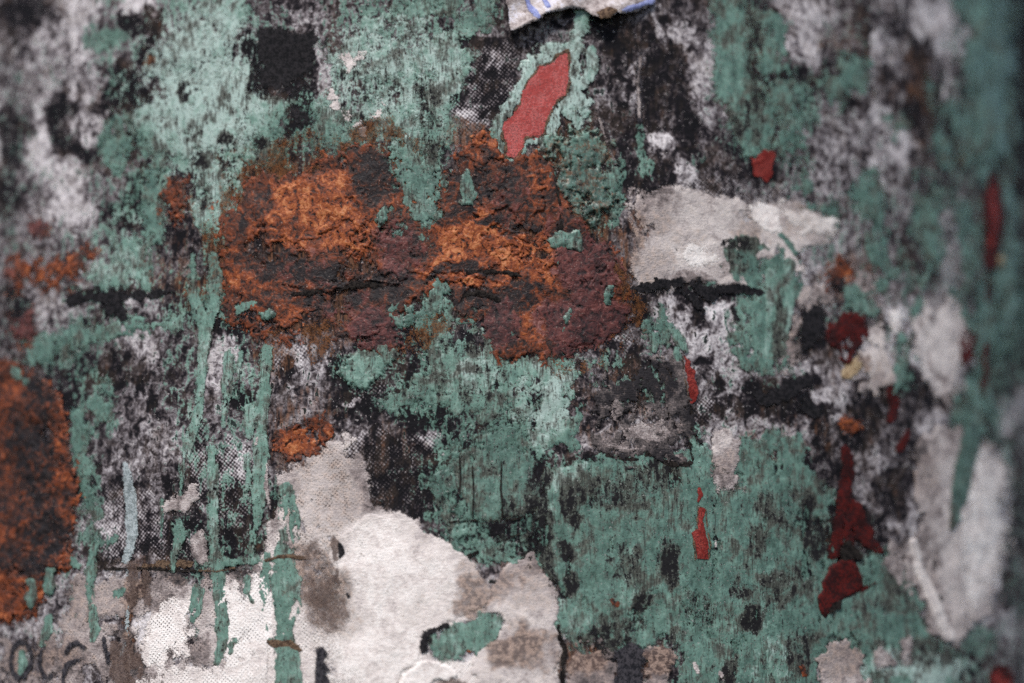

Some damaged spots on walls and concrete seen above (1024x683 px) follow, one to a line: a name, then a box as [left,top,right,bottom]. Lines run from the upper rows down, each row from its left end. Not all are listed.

rust [27,215,52,240]
rust [156,174,190,228]
rust [201,49,647,379]
peeling [682,0,907,376]
peeling [908,68,963,273]
rust [0,241,102,625]
peeling [190,529,208,565]
peeling [136,573,275,683]
rust [272,410,335,463]
peeling [302,277,968,683]